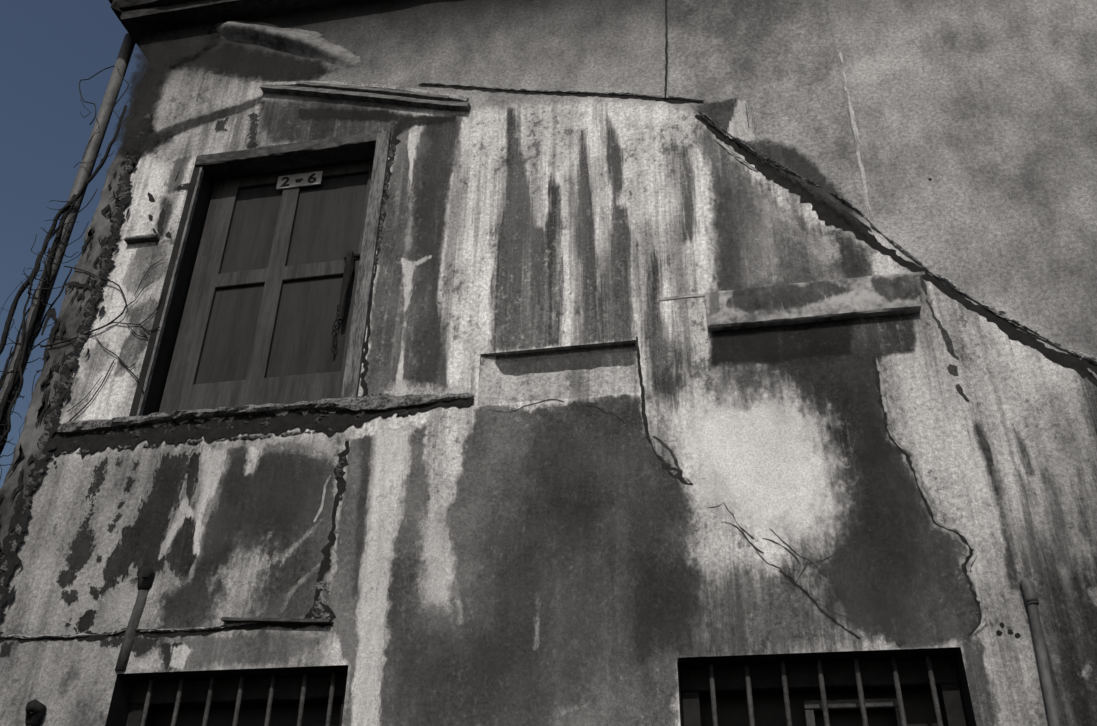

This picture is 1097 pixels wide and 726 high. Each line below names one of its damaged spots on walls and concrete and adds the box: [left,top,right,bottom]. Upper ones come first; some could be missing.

crack [0,113,350,643]
crack [360,121,403,397]
water stain [490,108,682,410]
crack [418,0,1097,485]
water stain [0,642,13,658]
water stain [56,354,1000,726]
crack [709,501,861,639]
water stain [1001,430,1097,726]